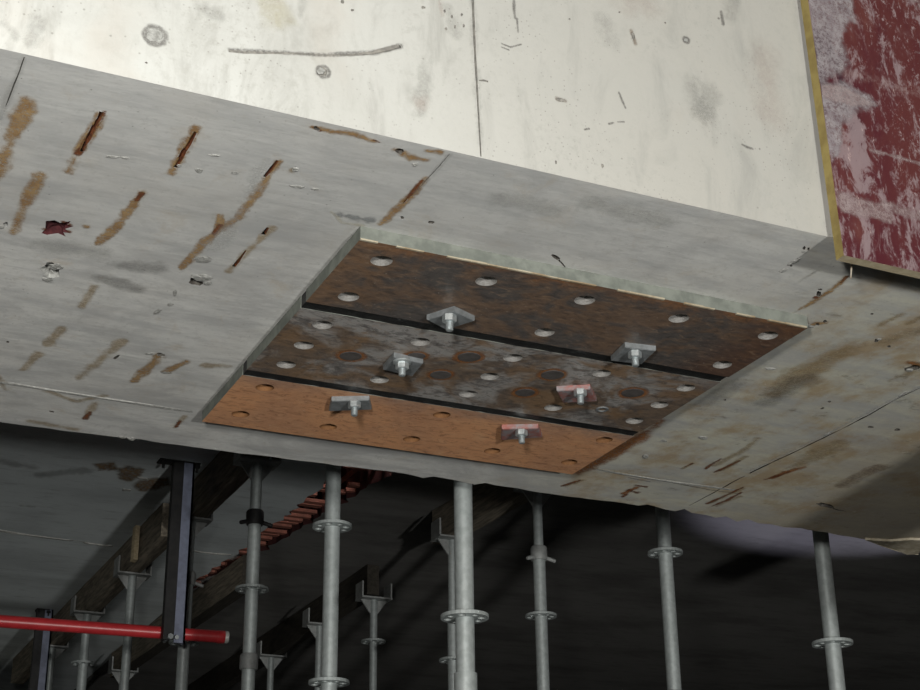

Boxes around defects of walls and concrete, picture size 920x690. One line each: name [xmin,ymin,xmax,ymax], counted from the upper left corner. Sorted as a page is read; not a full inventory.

crack [6,57,25,105]
rust [0,97,36,177]
rust [65,111,106,173]
rust [169,125,200,175]
rust [10,173,45,234]
rust [95,192,145,245]
rust [178,160,282,269]
rust [379,177,427,225]
rust [130,354,188,383]
rust [562,420,664,486]
crack [691,388,919,505]